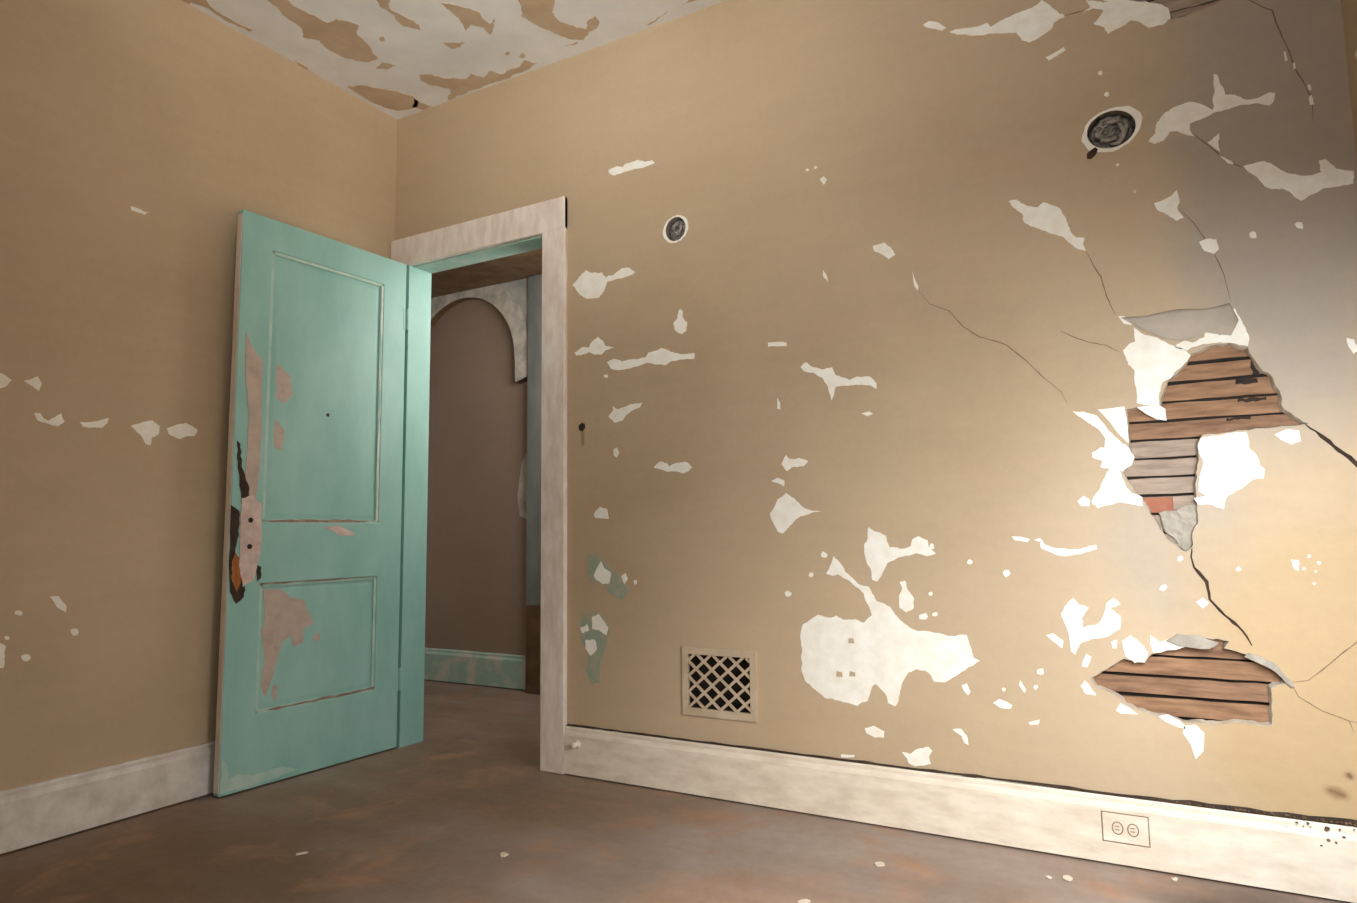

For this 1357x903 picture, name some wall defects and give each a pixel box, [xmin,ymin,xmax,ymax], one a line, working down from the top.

peeling [923,0,1065,42]
peeling [1149,74,1275,144]
crack [1249,0,1314,121]
peeling [1208,133,1354,200]
crack [1086,252,1115,314]
crack [923,296,1067,403]
spalling [1073,308,1309,561]
crack [1305,424,1357,467]
peeling [800,527,979,706]
crack [1190,546,1252,646]
spalling [1046,598,1294,758]
crack [1292,642,1357,732]